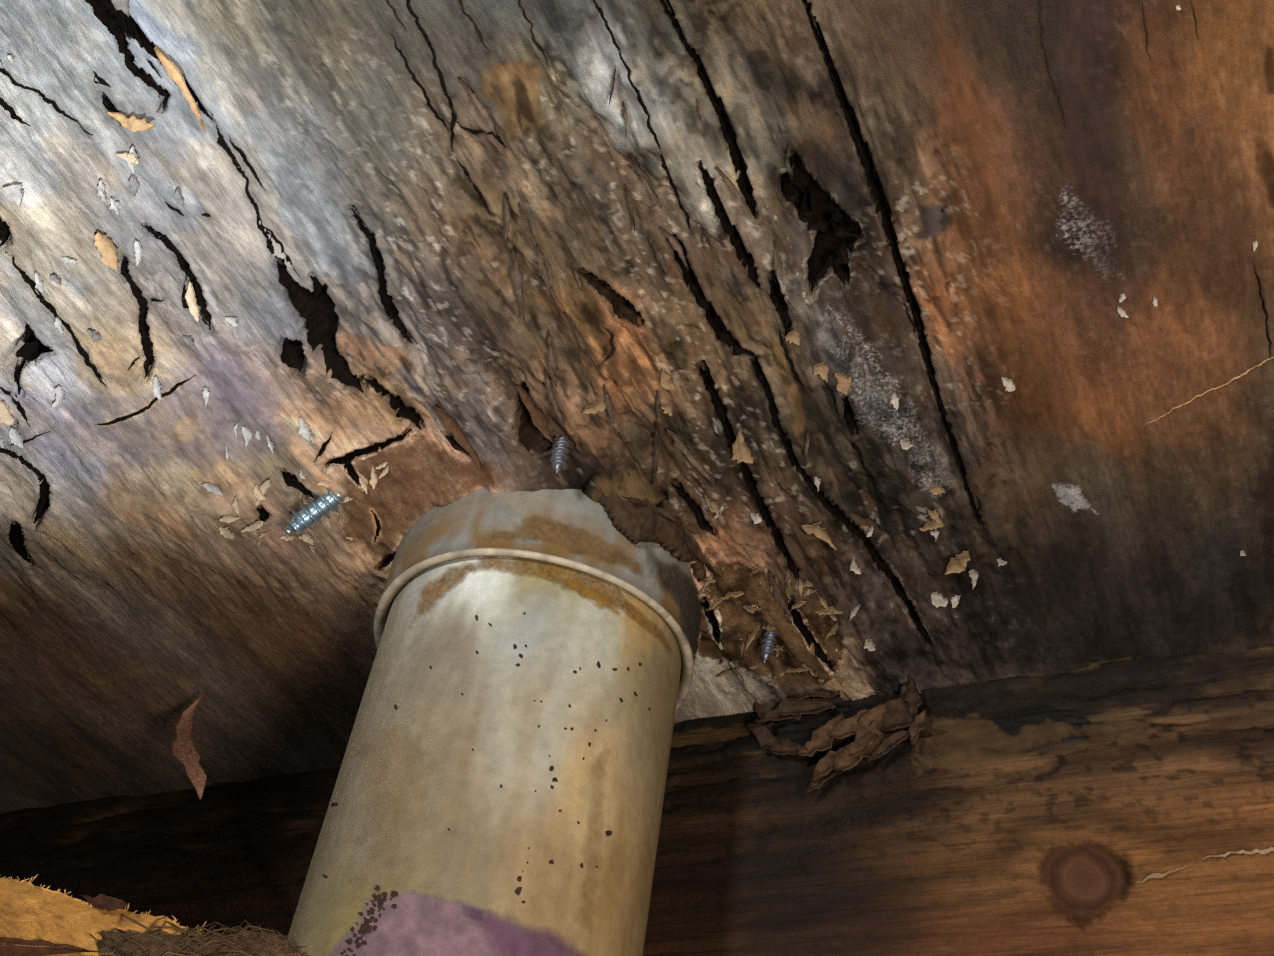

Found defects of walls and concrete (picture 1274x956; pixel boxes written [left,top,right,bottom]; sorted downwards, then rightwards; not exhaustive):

crack [0,202,212,425]
crack [0,0,301,278]
crack [282,378,421,569]
corrosion [418,556,669,649]
peeling [455,175,640,427]
corrosion [494,517,641,573]
crack [593,0,930,672]
peeling [697,549,860,685]
damp [824,308,948,497]
damp [920,204,947,237]
peeling [931,550,978,608]
damp [1060,197,1122,278]